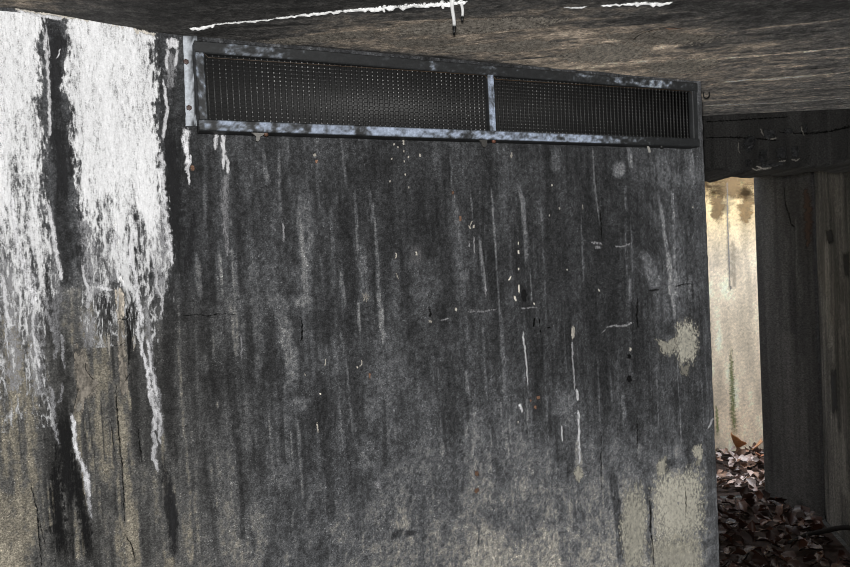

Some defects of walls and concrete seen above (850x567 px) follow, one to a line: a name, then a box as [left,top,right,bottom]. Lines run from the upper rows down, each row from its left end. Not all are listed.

damp [0,8,197,555]
damp [705,177,754,224]
crack [110,374,142,558]